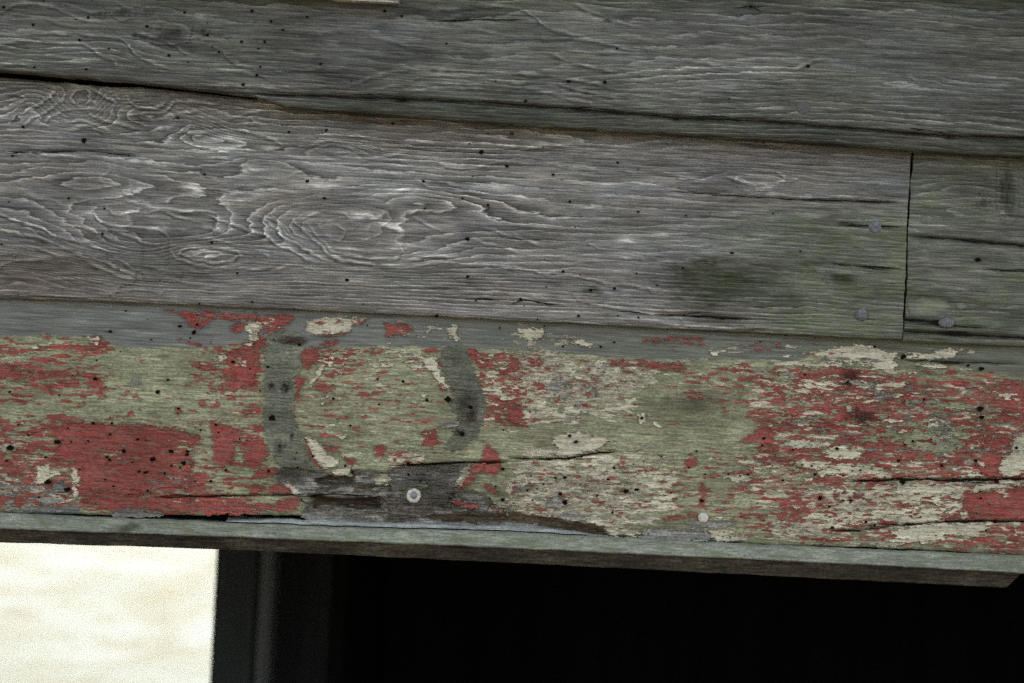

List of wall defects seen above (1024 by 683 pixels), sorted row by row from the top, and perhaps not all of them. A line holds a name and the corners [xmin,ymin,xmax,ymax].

peeling [0,309,1024,554]
crack [389,451,624,466]
crack [851,477,1024,485]